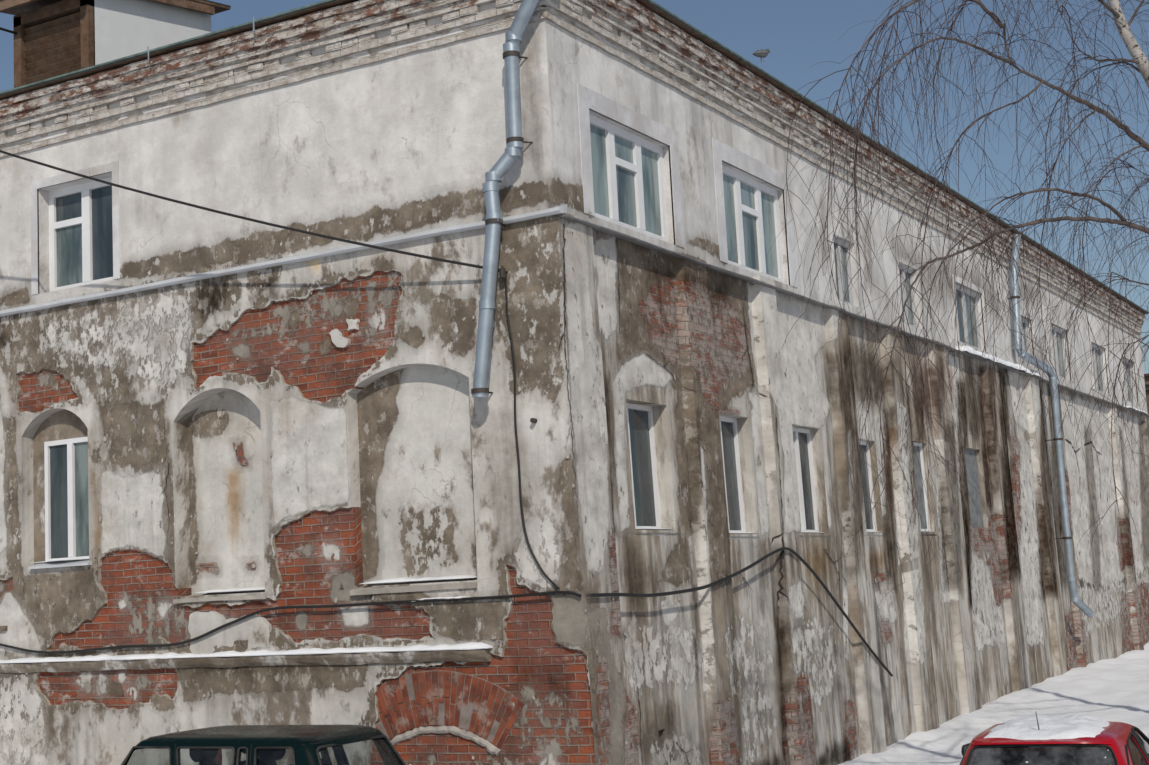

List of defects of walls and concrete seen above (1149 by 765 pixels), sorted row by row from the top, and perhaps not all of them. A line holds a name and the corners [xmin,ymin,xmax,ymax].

spalling [0,177,926,765]
water stain [885,471,896,586]
water stain [941,366,1021,605]
water stain [1037,392,1066,597]